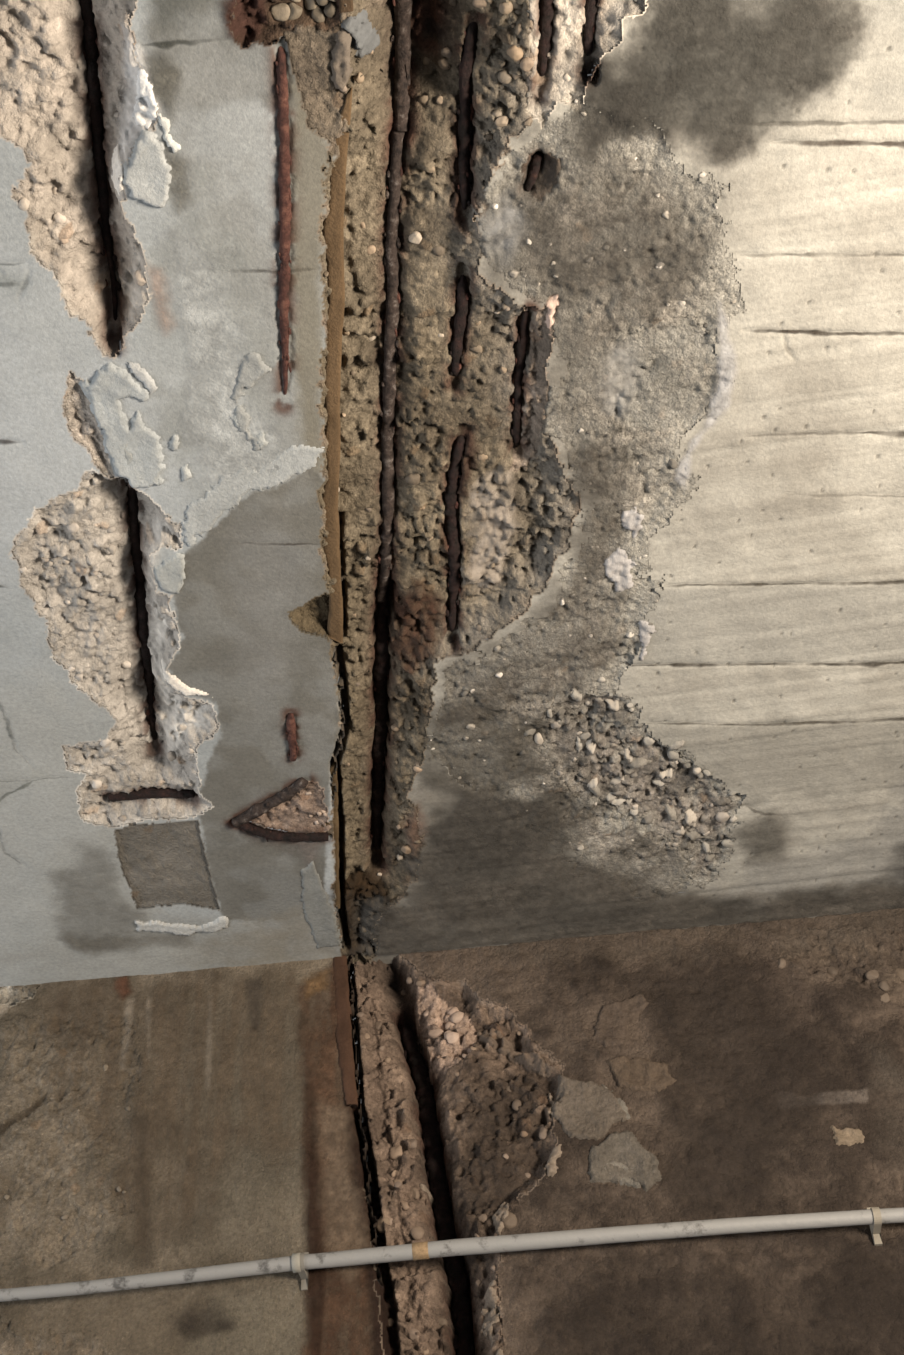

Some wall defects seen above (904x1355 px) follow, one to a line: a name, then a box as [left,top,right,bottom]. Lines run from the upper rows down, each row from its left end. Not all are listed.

rust [224,0,266,44]
damp [574,0,862,161]
crack [783,121,904,146]
crack [767,328,904,336]
rust [458,428,474,496]
crack [853,578,904,586]
spalling [0,0,747,1281]
rust [396,593,439,674]
crack [824,659,904,667]
damp [354,718,904,955]
rust [334,864,391,955]
spalling [384,1252,504,1355]